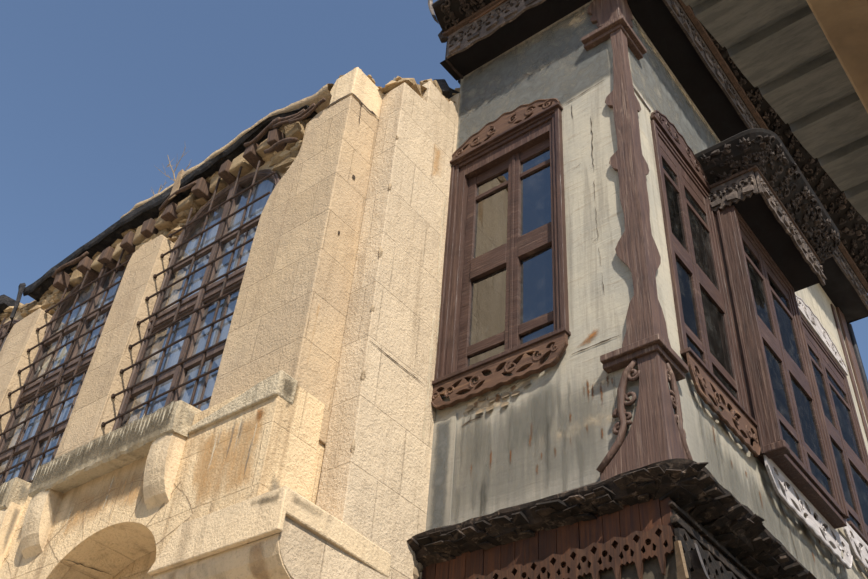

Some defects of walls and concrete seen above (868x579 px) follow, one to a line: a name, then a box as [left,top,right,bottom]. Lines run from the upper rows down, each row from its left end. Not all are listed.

crack [567,81,604,291]
peeling [465,380,531,414]
water stain [430,422,449,530]